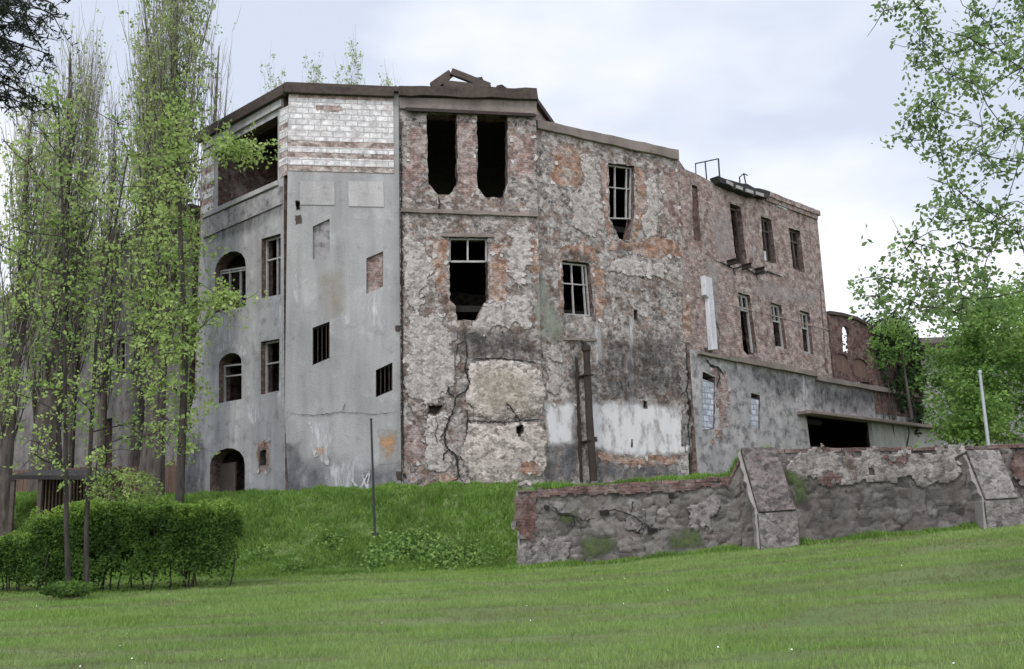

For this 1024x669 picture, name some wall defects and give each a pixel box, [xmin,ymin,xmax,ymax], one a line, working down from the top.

peeling [550,142,682,323]
crack [286,110,564,485]
peeling [592,369,693,469]
spalling [256,437,271,476]
peeling [308,421,332,465]
peeling [785,443,967,488]
crack [550,501,666,534]